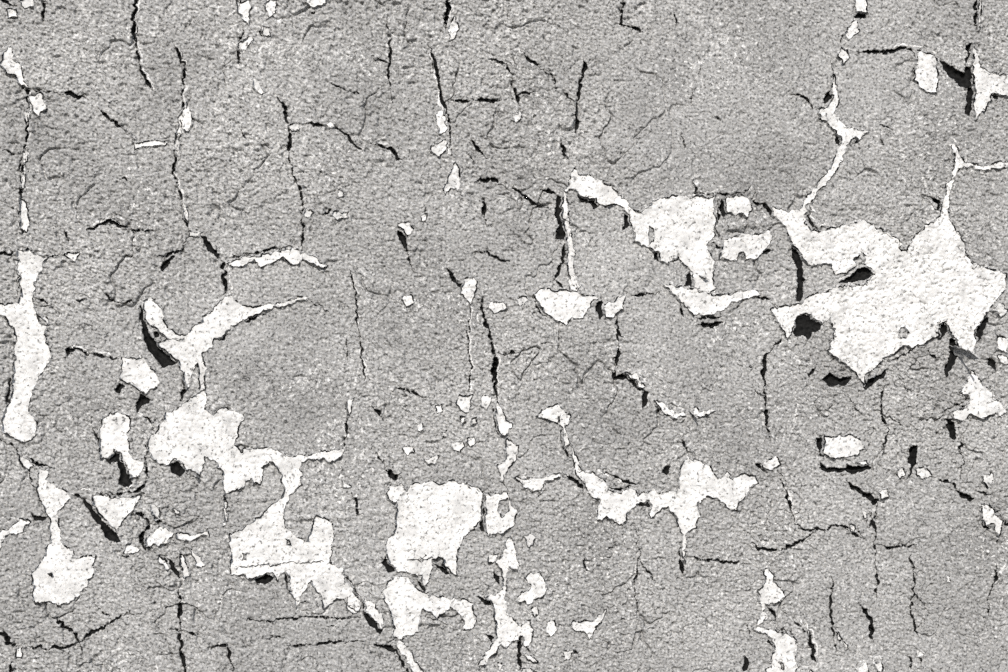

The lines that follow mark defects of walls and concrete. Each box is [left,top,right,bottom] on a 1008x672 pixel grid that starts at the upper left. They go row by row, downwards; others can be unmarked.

peeling [235,0,278,63]
crack [158,43,227,294]
crack [277,97,403,254]
crack [426,0,588,226]
peeling [487,0,1008,439]
crack [447,270,519,399]
crack [0,604,142,672]
peeling [0,245,783,672]
peeling [747,567,818,672]
crack [692,478,884,649]
peeling [816,433,872,474]
peeling [895,465,1008,543]